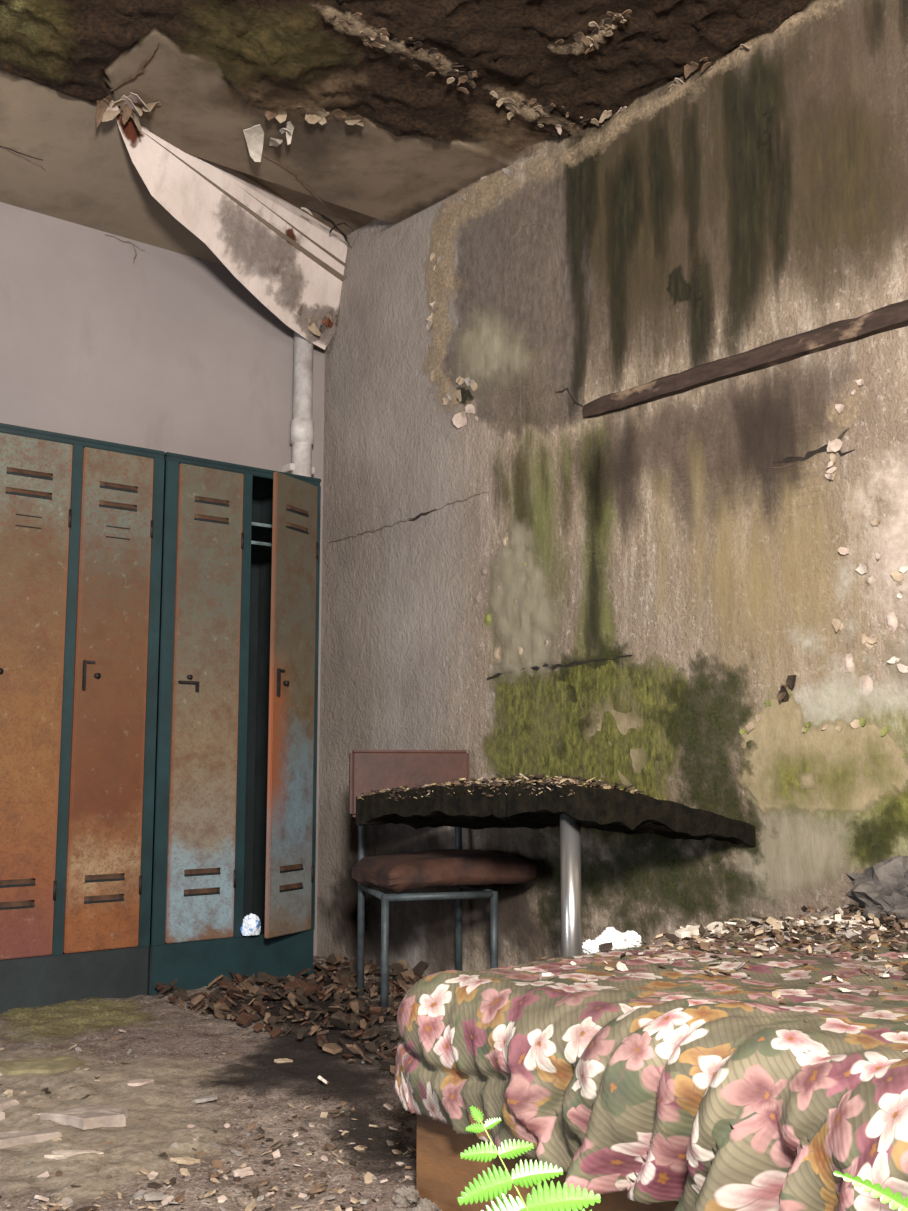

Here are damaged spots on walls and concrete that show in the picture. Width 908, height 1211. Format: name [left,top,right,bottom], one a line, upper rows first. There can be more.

damp [0,0,70,78]
damp [222,205,302,308]
spalling [0,0,842,432]
damp [567,0,908,402]
crack [329,492,486,543]
damp [566,365,831,525]
crack [758,426,855,469]
spalling [738,675,908,905]